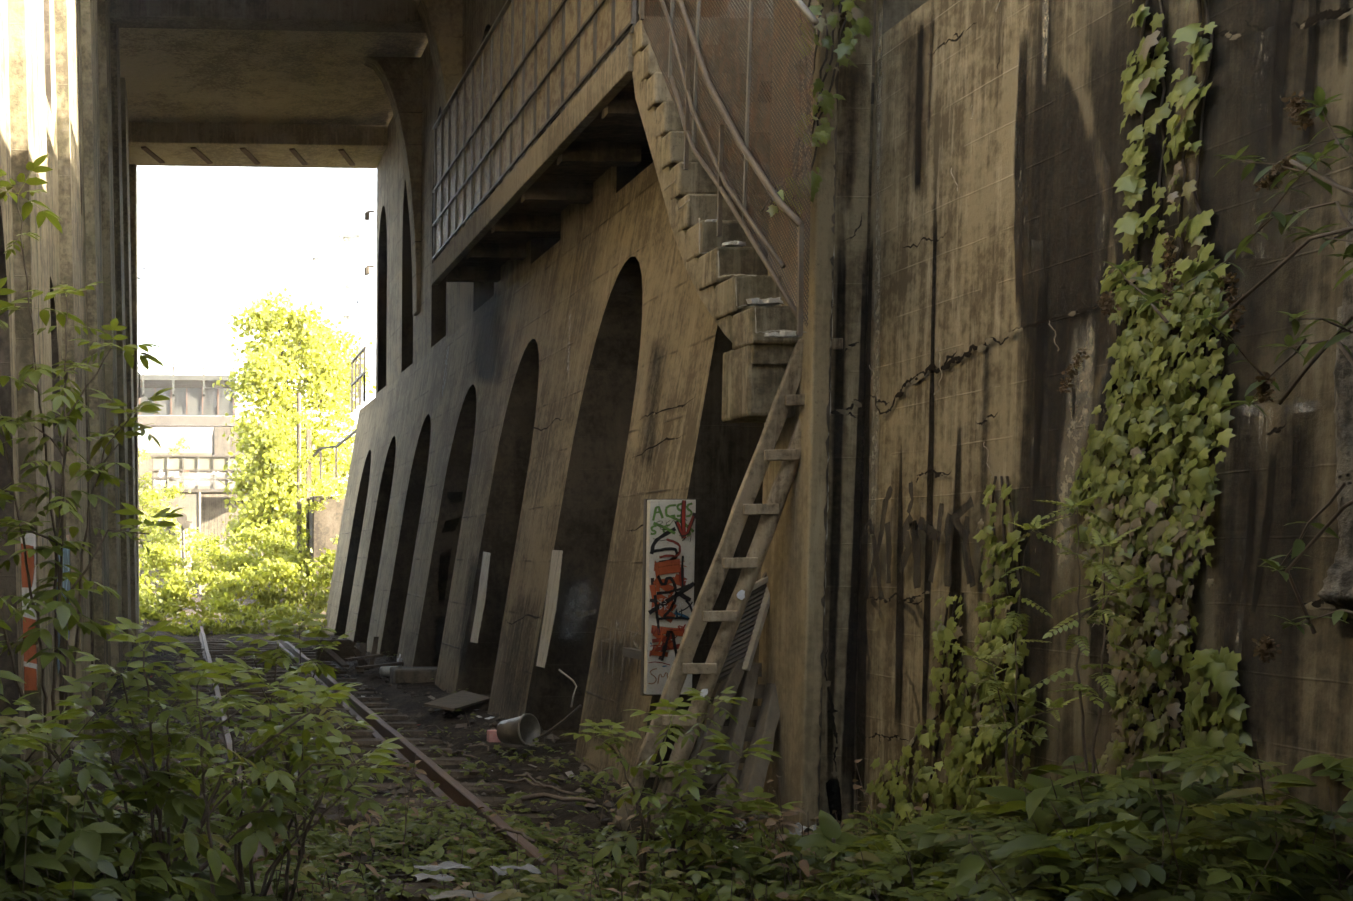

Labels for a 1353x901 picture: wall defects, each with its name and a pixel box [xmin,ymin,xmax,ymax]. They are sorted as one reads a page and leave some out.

water stain [1201,0,1316,373]
water stain [1339,0,1349,61]
crack [831,305,1099,418]
water stain [1006,0,1169,749]
water stain [1216,405,1314,737]